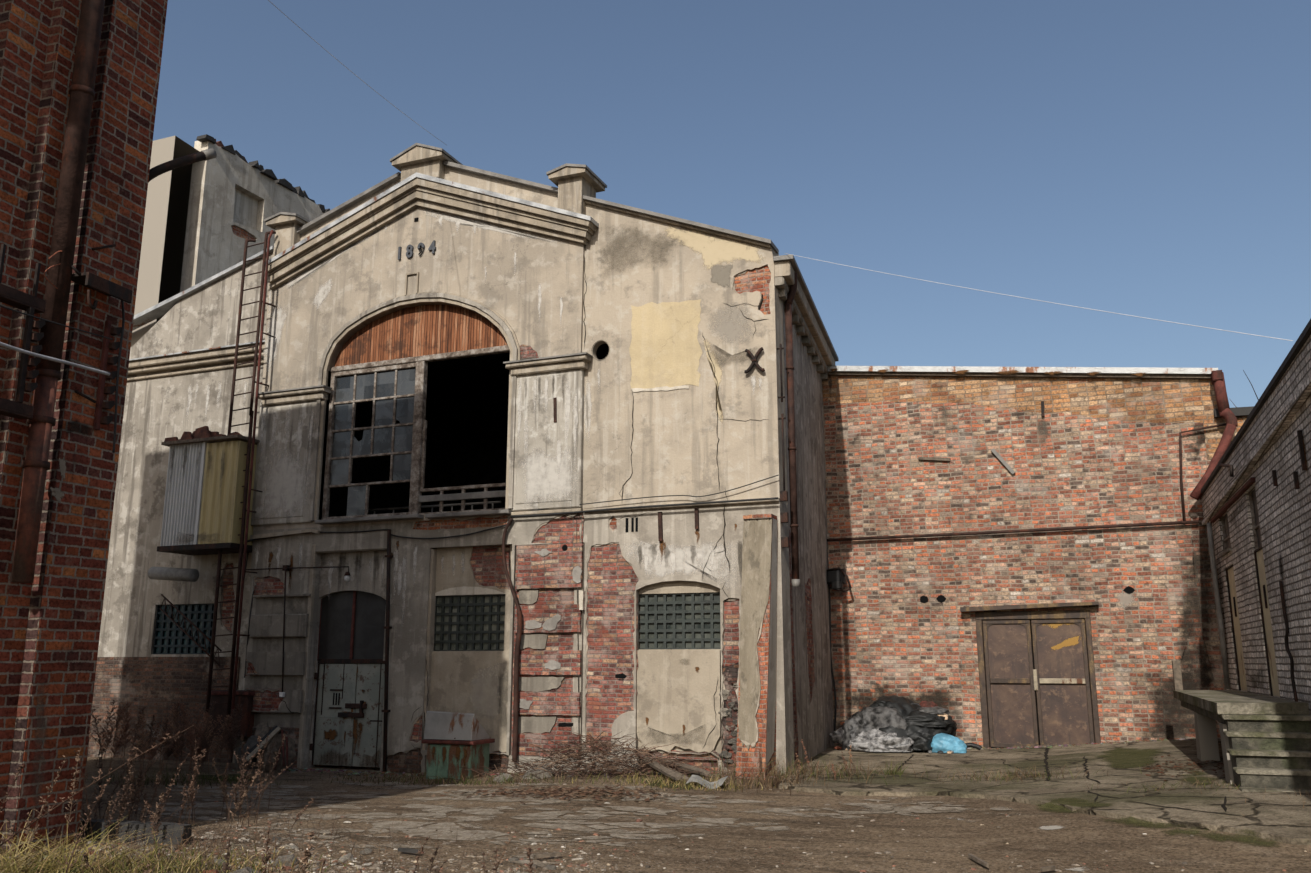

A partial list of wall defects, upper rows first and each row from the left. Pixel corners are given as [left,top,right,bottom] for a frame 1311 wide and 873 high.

spalling [733,265,771,315]
spalling [412,515,508,530]
crack [604,392,648,519]
crack [702,333,769,594]
corrosion [324,667,381,766]
spalling [470,513,639,773]
spalling [640,576,771,780]
spalling [789,530,815,765]